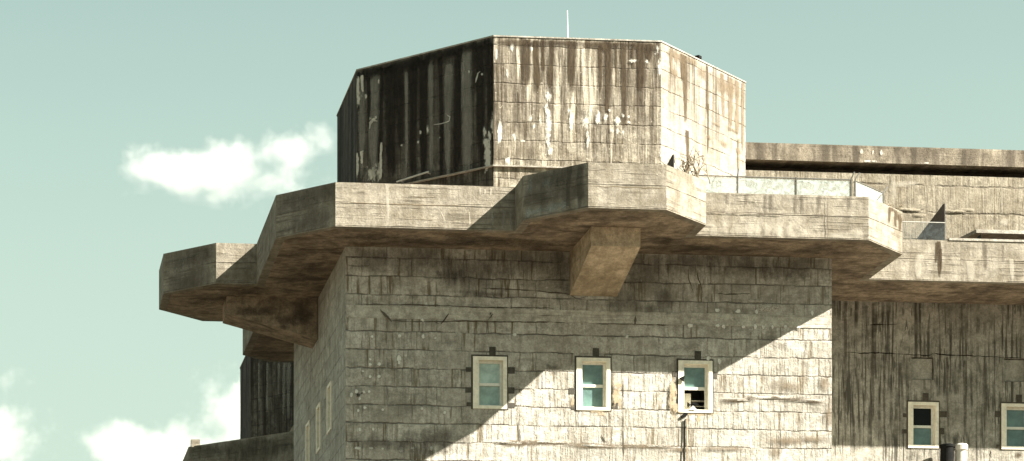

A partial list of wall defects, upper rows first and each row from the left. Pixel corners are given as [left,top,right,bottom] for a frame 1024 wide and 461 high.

peeling [356,75,367,104]
damp [357,39,657,175]
peeling [356,142,382,181]